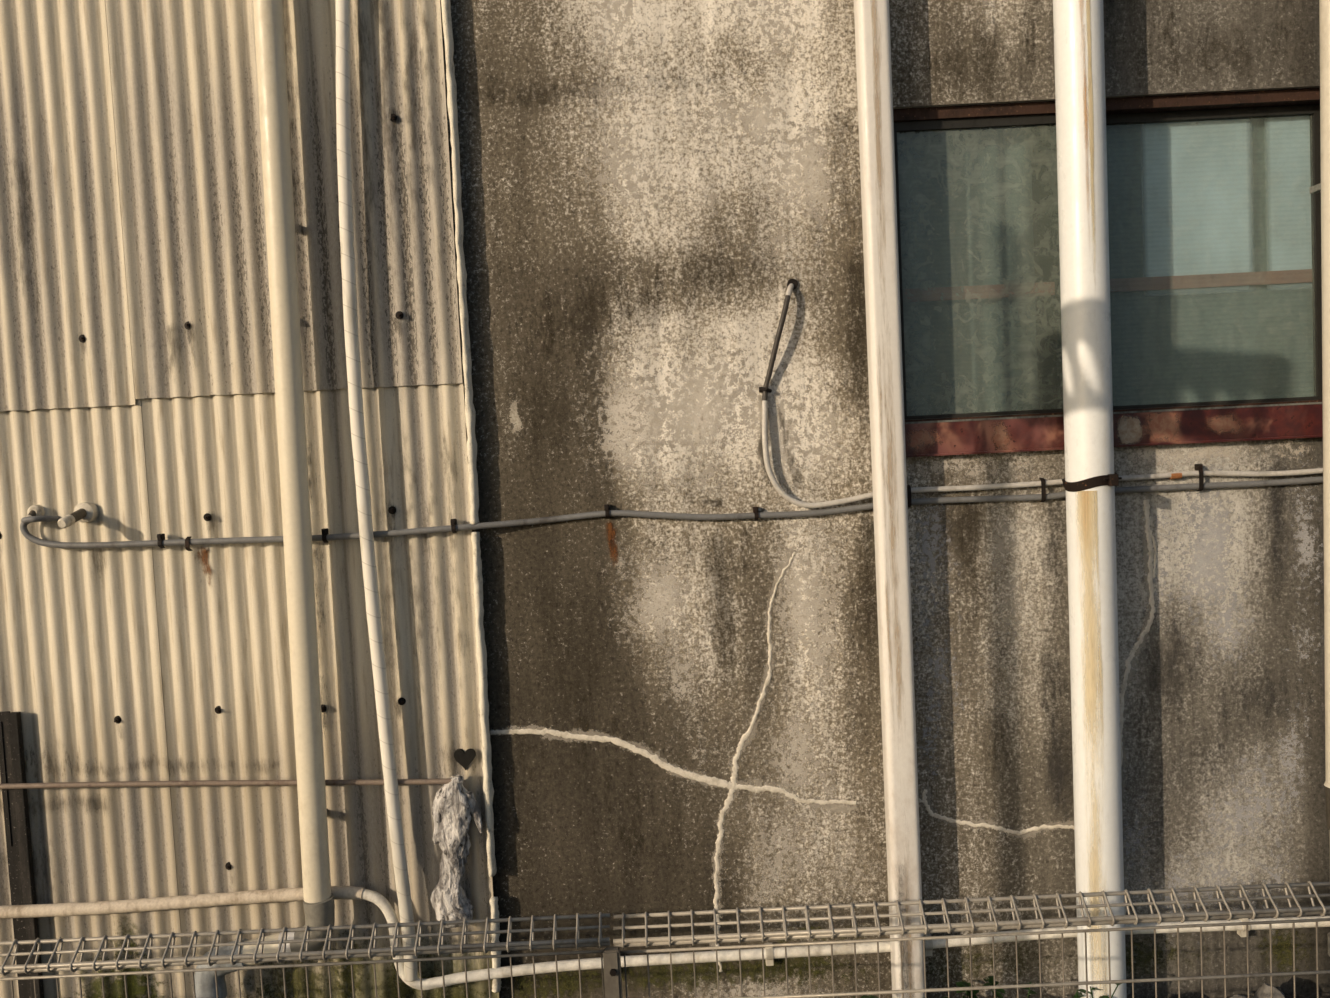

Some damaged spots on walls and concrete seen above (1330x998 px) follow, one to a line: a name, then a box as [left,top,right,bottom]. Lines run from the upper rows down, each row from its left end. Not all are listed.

damp [872,0,881,181]
damp [849,264,866,396]
damp [1270,476,1284,562]
damp [860,525,901,686]
crack [1120,493,1157,795]
crack [490,547,857,972]
crack [919,786,1074,841]
crack [1123,855,1133,915]
damp [901,910,911,998]